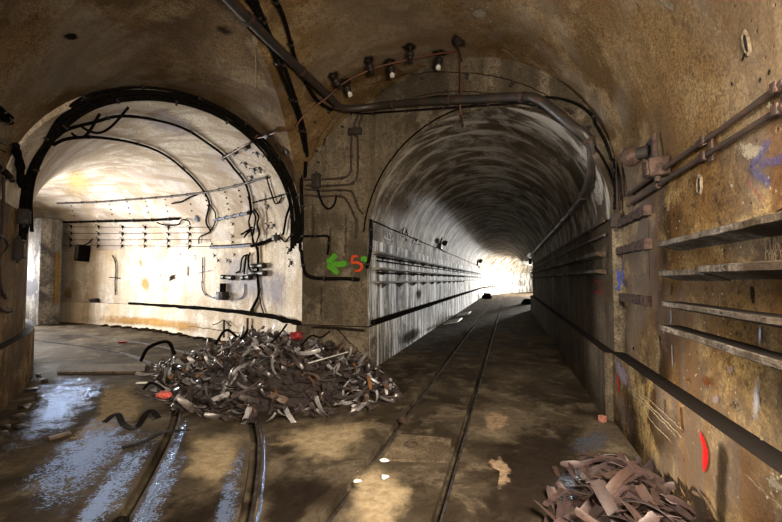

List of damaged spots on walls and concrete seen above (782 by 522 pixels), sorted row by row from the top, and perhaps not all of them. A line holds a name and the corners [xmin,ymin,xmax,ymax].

water stain [164,494,228,522]